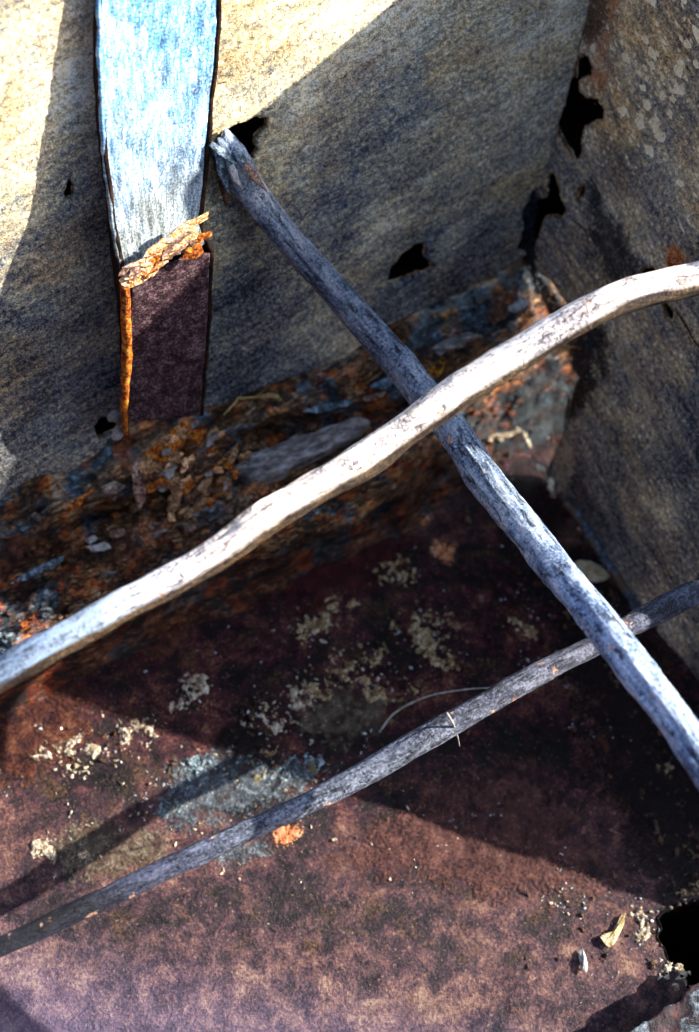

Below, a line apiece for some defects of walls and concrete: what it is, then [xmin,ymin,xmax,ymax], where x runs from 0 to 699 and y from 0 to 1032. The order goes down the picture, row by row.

rust [582,0,620,95]
spalling [229,116,264,155]
spalling [388,242,430,280]
rust [0,127,699,694]
rust [0,412,699,958]
spalling [629,880,699,992]